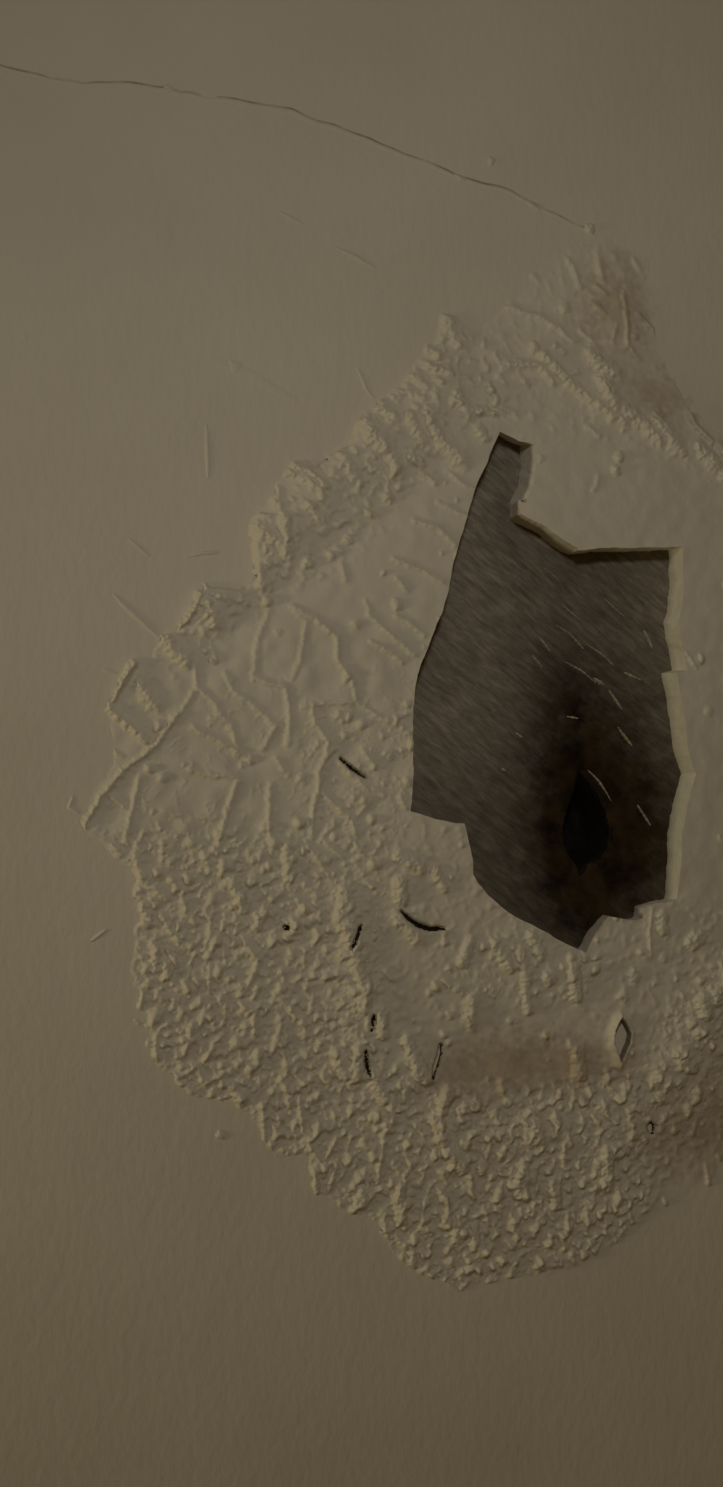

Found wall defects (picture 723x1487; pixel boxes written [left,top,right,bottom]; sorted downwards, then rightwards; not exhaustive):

spalling [110,432,723,1291]